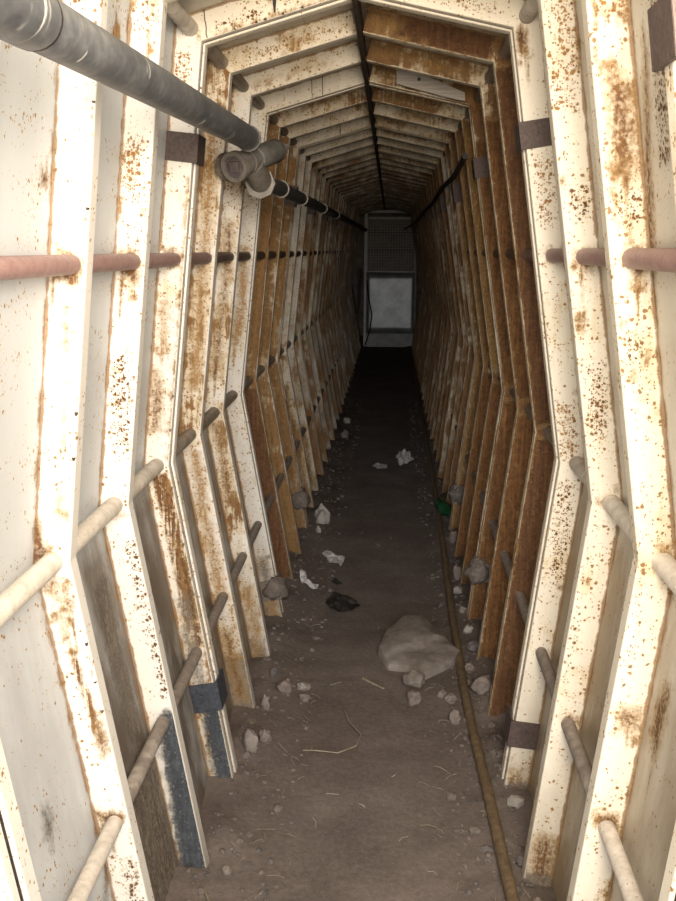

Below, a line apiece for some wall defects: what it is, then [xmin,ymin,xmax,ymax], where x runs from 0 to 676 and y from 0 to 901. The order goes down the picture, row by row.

rust [372,14,497,60]
rust [593,0,630,26]
rust [605,27,669,248]
rust [51,260,86,303]
rust [634,269,656,315]
rust [451,24,608,716]
rust [213,425,233,509]
rust [244,387,292,578]
rust [153,473,205,648]
rust [192,451,225,602]
rust [615,687,669,753]
rust [532,836,558,878]